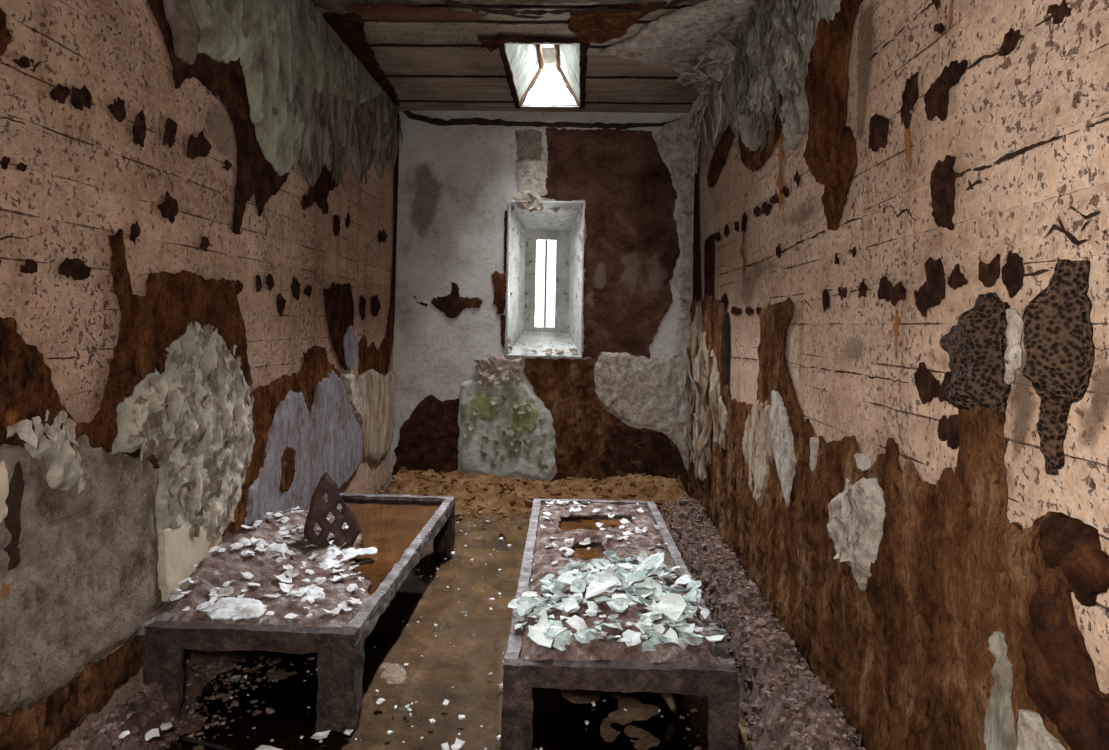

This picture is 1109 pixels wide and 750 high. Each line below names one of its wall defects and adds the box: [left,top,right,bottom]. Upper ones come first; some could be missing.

flaking render [147,0,444,235]
crack [955,117,1109,191]
flaking render [0,229,396,713]
spalling [391,0,1077,750]
flaking render [145,722,172,741]
flaking render [311,730,331,740]